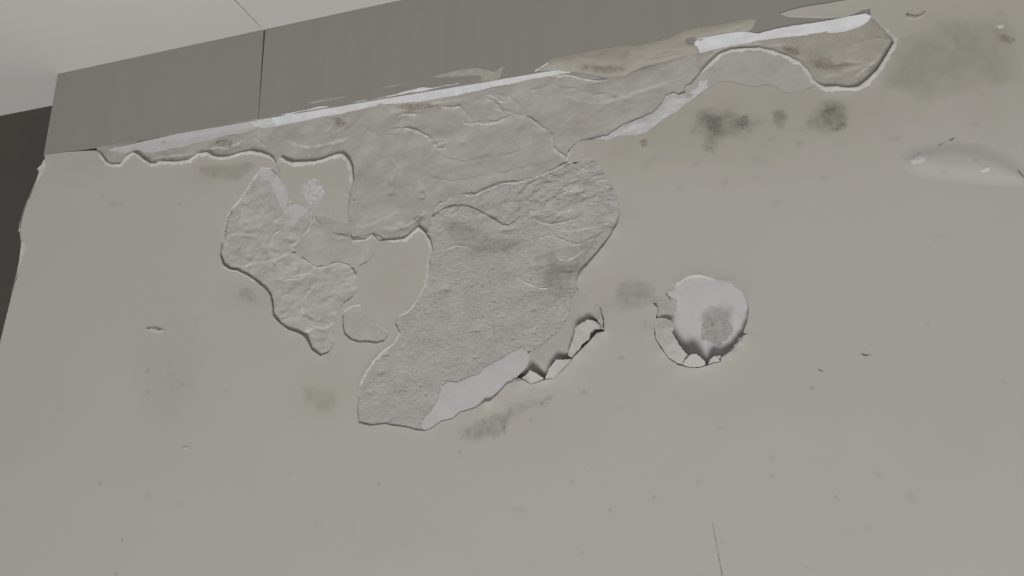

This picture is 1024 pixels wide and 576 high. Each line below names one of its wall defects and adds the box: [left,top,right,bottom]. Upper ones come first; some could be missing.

flaking render [97,14,897,431]